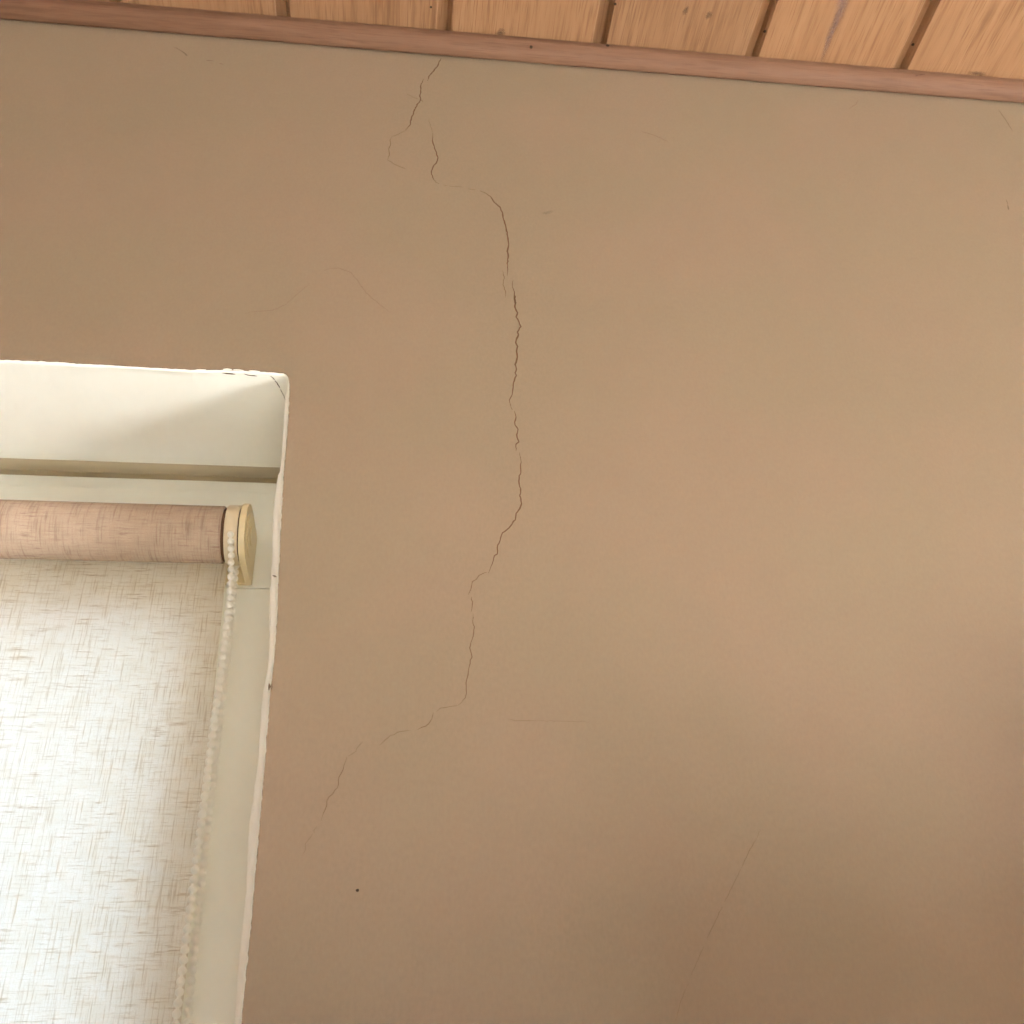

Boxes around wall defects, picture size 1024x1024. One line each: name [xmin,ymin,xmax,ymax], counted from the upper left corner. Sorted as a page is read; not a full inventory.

crack [302,59,522,856]